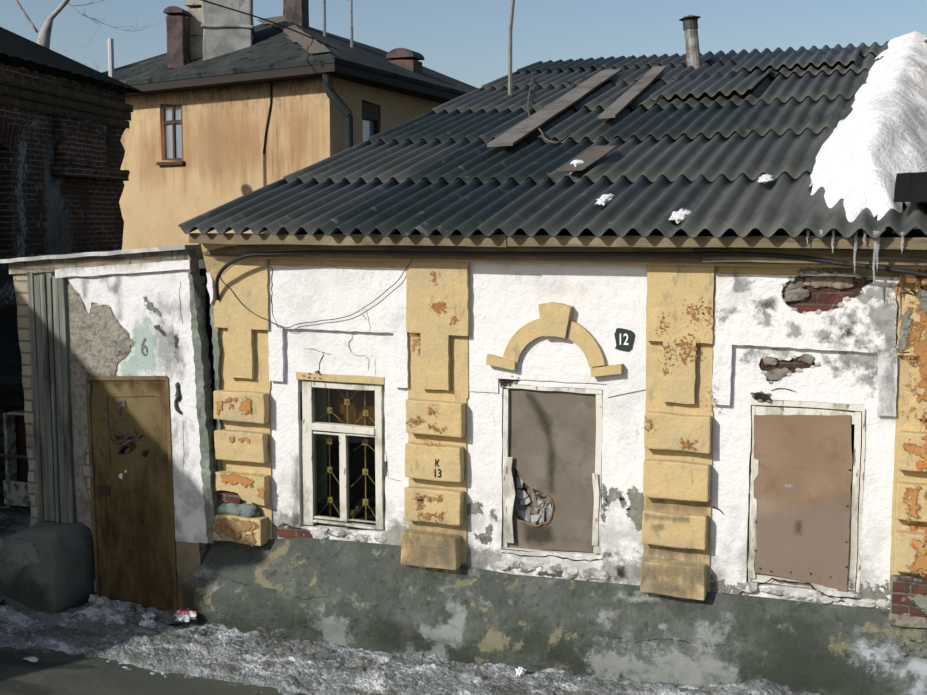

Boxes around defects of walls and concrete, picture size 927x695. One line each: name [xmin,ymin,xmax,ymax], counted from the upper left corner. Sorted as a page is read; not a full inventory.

spalling [781,267,875,315]
peeling [143,297,179,353]
spalling [750,354,822,402]
peeling [888,269,927,471]
peeling [600,484,644,531]
leakage [463,549,502,571]
leakage [601,552,643,585]
flaking render [827,486,927,659]
leakage [193,616,285,637]
leakage [446,644,471,664]
leakage [557,640,589,676]
leakage [749,629,927,695]